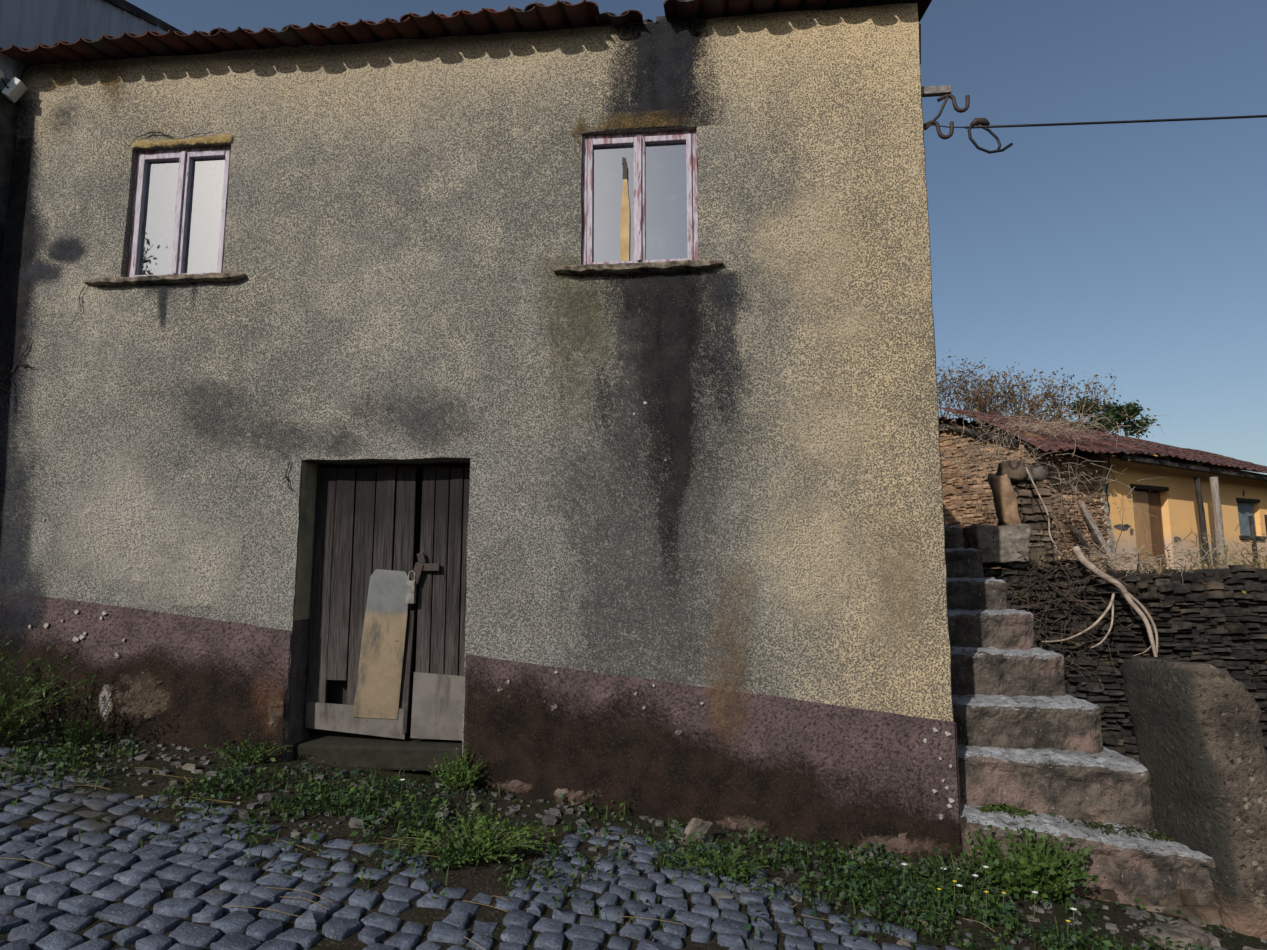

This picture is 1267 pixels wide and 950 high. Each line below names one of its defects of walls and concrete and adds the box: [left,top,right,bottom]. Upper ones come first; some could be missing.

damp [649,20,701,128]
damp [761,201,842,262]
damp [0,100,286,762]
damp [463,270,961,863]
spalling [99,671,170,721]